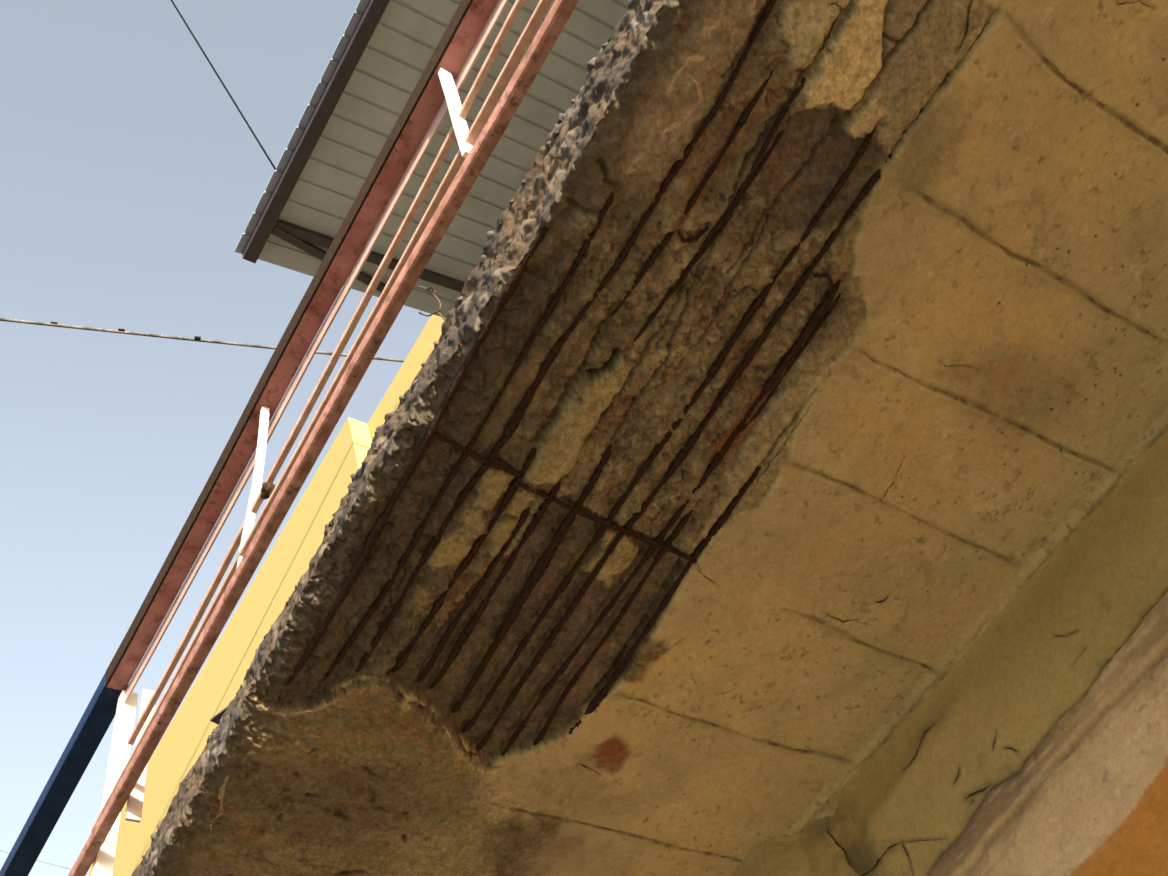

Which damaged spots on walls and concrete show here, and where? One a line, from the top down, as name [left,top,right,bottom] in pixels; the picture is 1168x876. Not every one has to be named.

spalling [246,0,997,767]
corrosion [596,738,628,771]
crack [955,768,990,803]
crack [827,829,943,876]